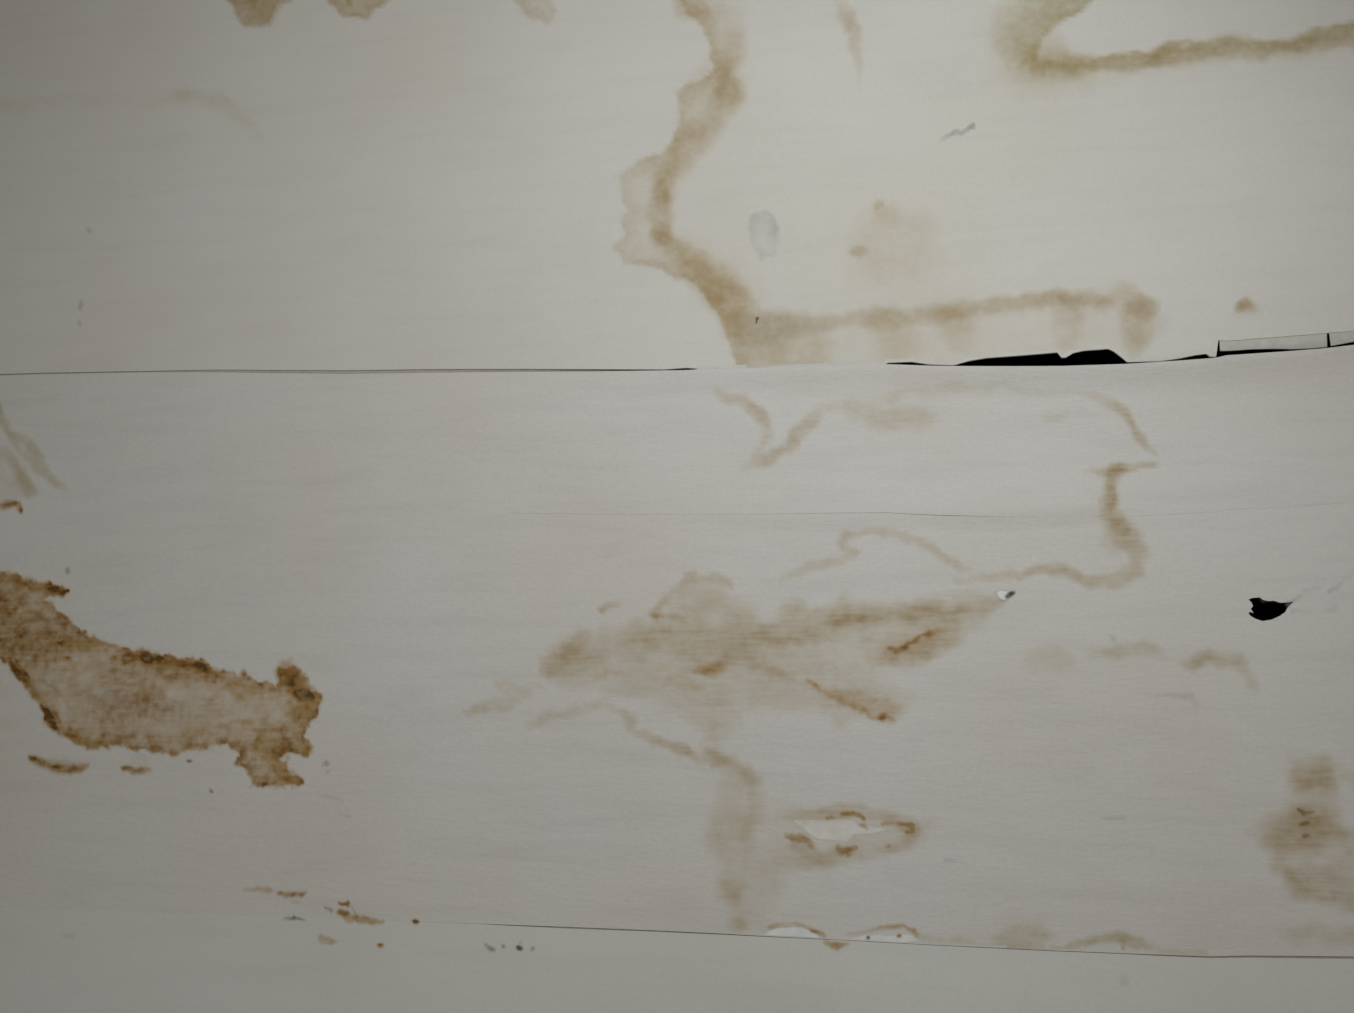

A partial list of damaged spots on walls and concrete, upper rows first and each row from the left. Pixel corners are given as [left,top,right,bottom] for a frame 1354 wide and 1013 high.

crack [890,331,1354,366]
crack [0,368,695,376]
damp [888,630,935,654]